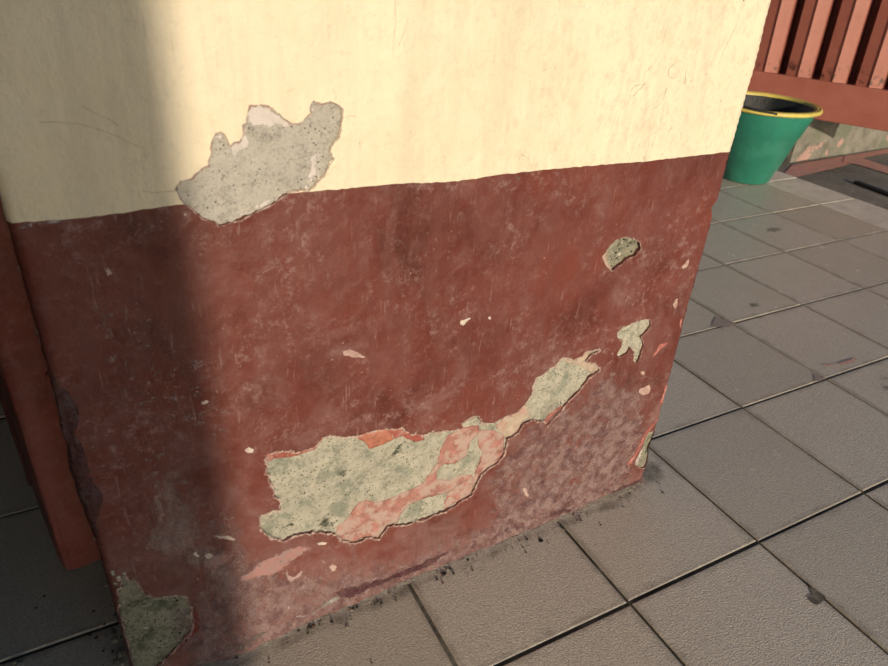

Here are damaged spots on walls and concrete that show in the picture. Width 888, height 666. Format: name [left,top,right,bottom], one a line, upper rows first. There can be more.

spalling [175,100,344,227]
spalling [602,236,642,271]
spalling [617,319,650,375]
spalling [240,349,601,582]
spalling [613,415,659,493]
peeling [337,553,448,598]
spalling [110,570,199,666]